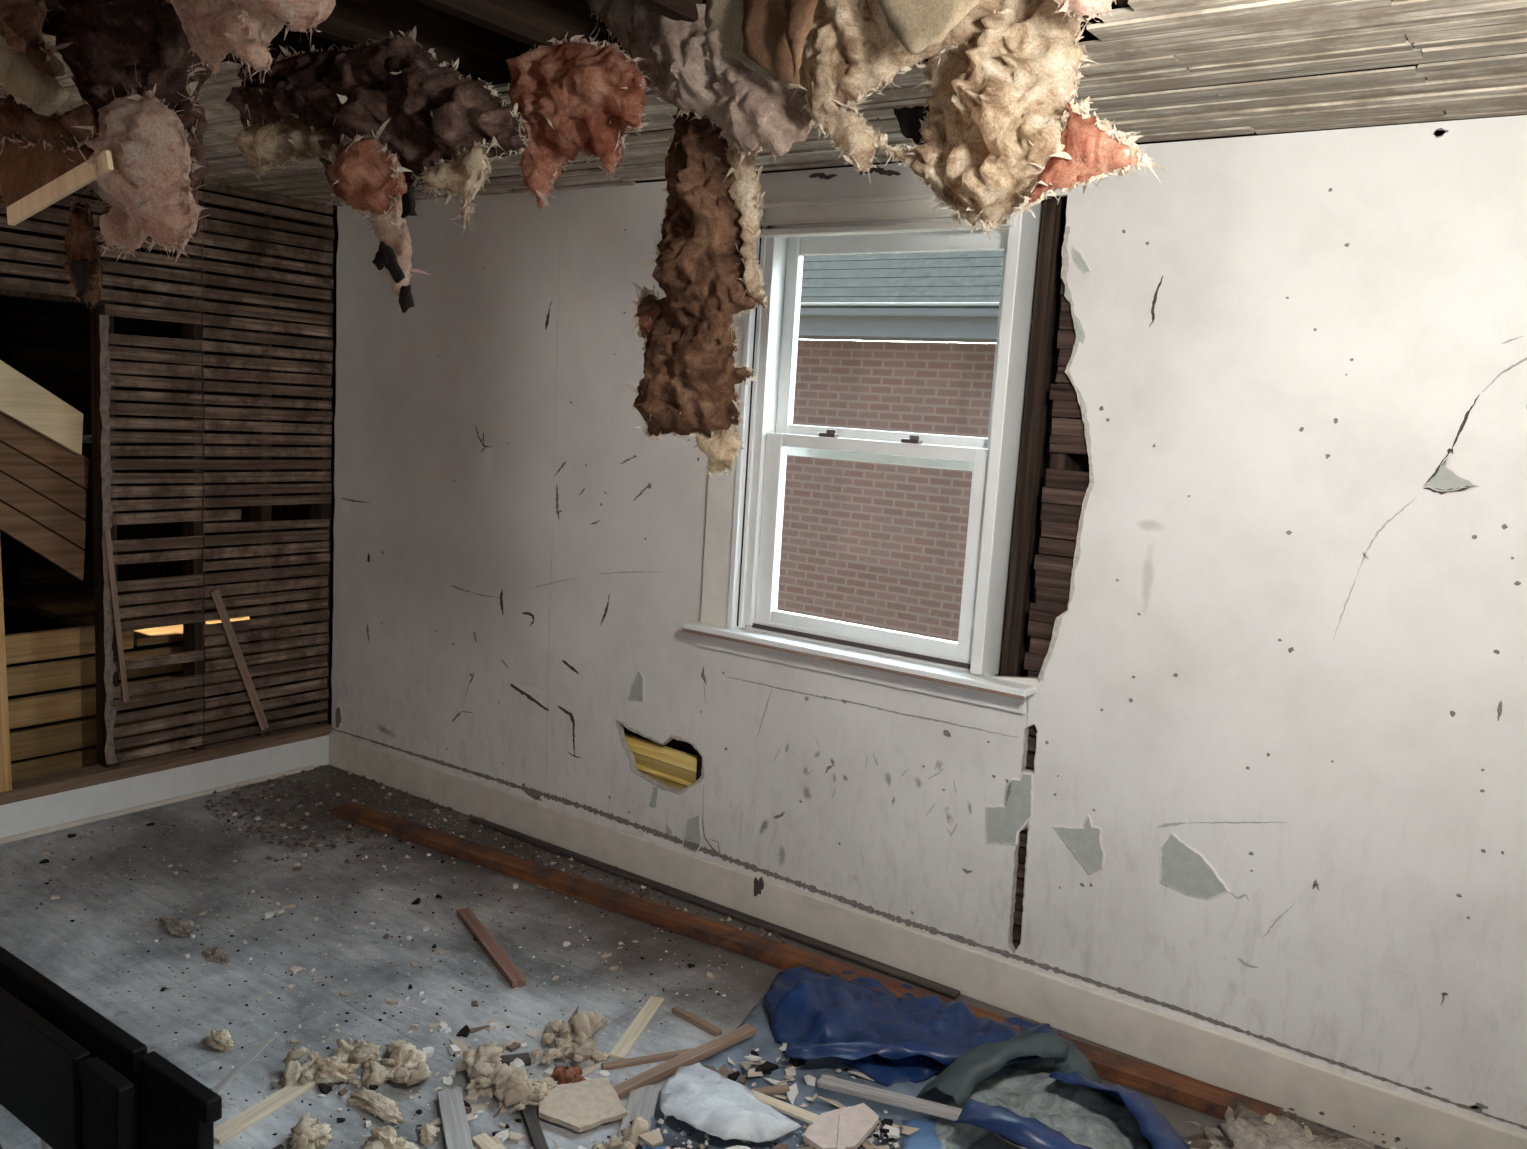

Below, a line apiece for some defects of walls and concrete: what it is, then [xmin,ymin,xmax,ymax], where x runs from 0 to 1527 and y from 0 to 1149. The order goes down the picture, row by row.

crack [1483,336,1527,392]
flaking render [1038,226,1110,681]
crack [1333,498,1416,640]
peeling [628,668,645,703]
spalling [615,718,720,854]
peeling [985,772,1034,846]
peeling [1052,809,1106,887]
peeling [1159,831,1231,901]